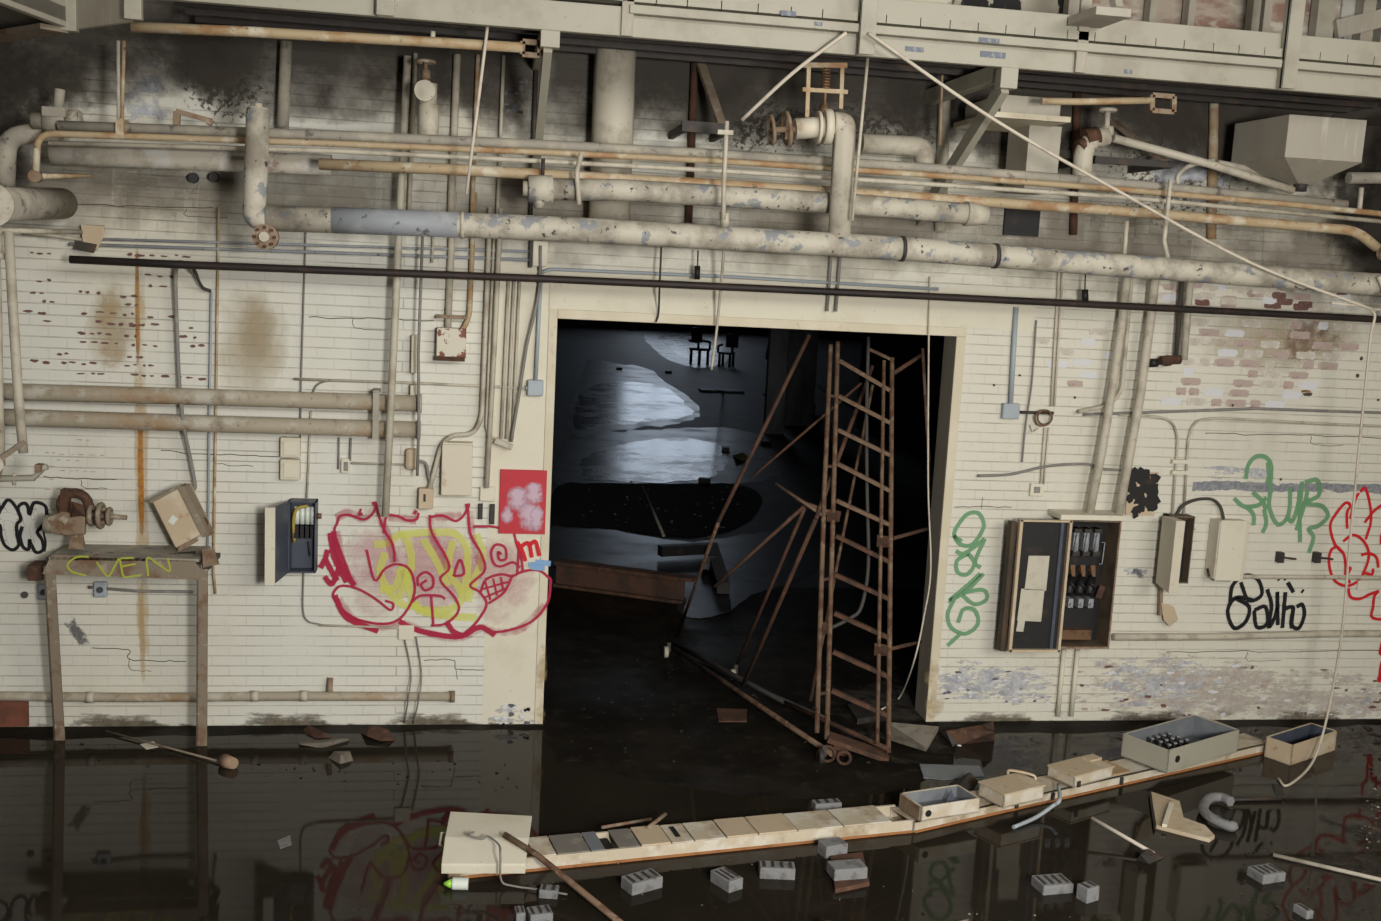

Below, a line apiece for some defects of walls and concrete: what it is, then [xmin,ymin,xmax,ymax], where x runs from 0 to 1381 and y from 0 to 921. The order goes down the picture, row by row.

peeling [1158,282,1363,408]
peeling [936,661,1051,705]
spalling [1075,654,1381,720]